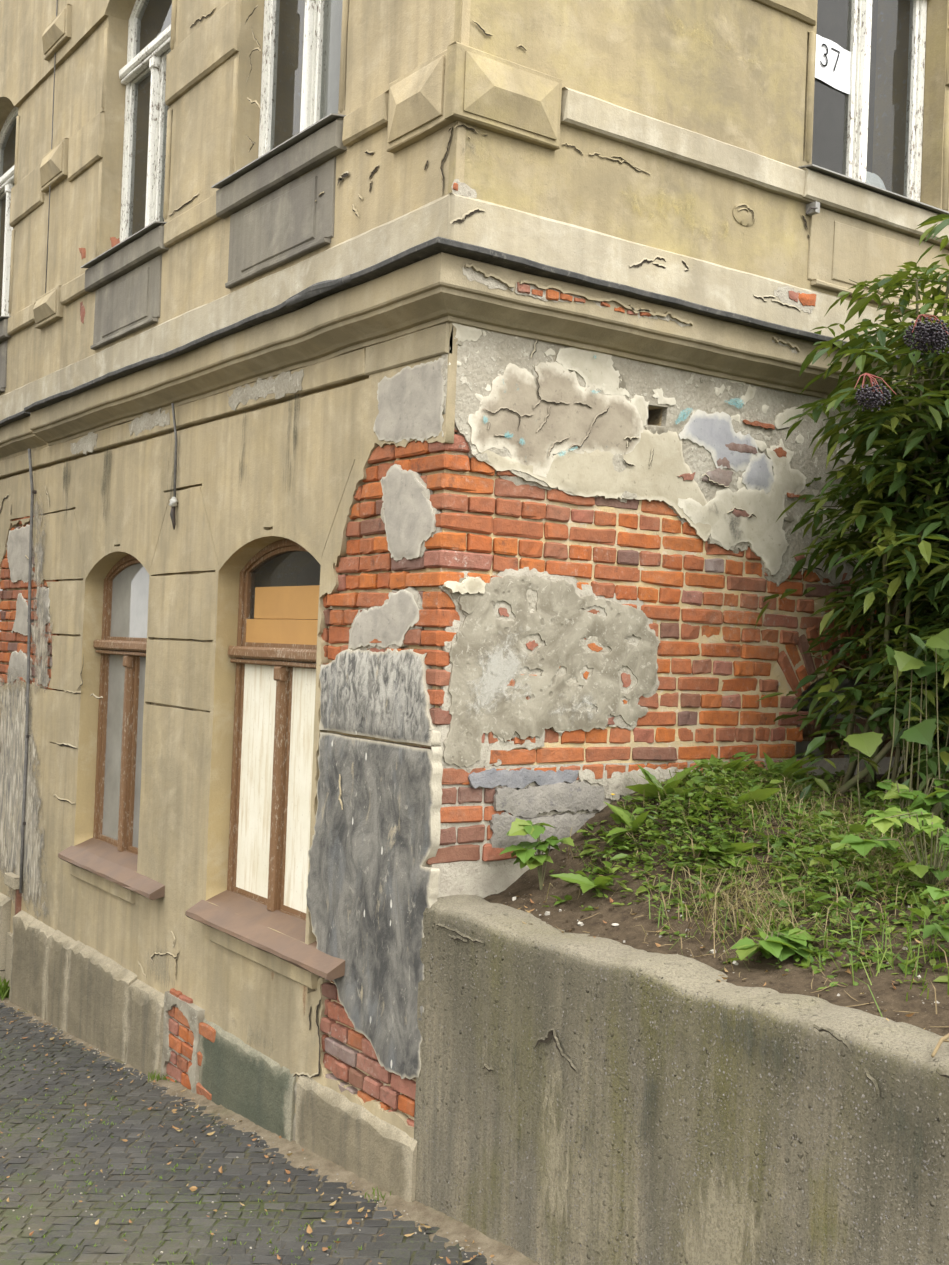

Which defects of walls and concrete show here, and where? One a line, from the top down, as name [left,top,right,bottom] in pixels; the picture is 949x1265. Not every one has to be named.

crack [315,149,379,217]
crack [424,123,488,224]
crack [562,142,651,175]
flaking render [463,263,693,327]
peeling [70,432,98,455]
peeling [128,408,170,436]
peeling [227,369,304,411]
crack [482,339,610,457]
crack [623,436,654,468]
peeling [0,502,59,916]
flaking render [306,323,883,1127]
flaking render [161,988,216,1100]